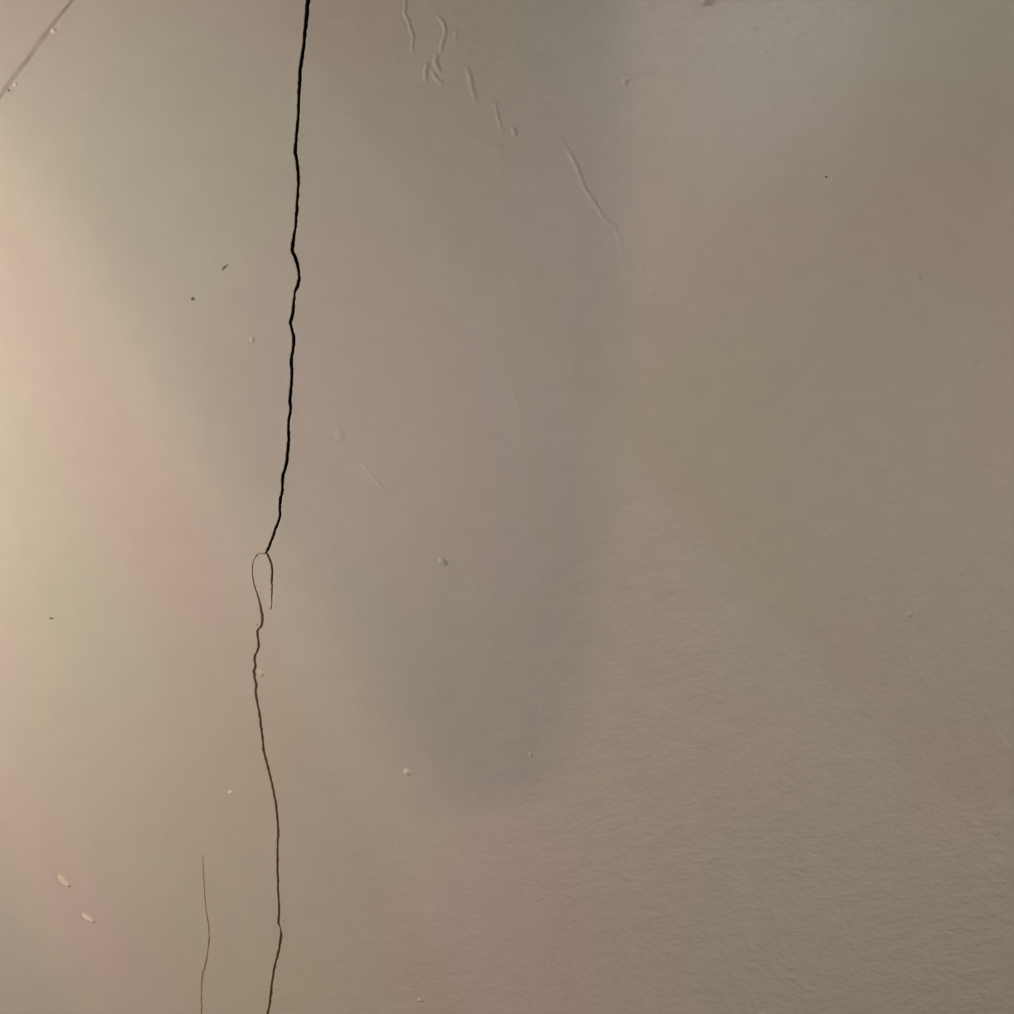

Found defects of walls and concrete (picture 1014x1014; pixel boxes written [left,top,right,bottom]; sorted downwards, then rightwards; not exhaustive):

crack [245,0,317,1014]